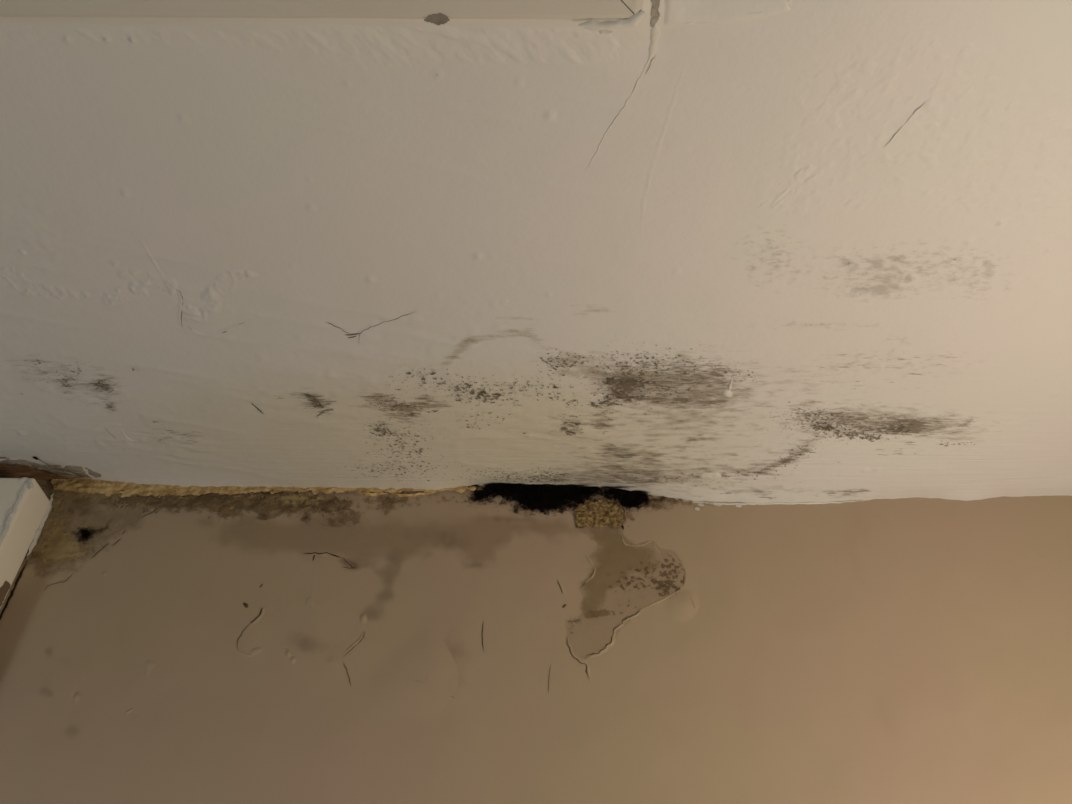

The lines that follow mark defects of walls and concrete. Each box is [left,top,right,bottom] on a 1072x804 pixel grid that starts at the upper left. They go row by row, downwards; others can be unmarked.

crack [584,23,661,172]
crack [326,309,416,344]
water stain [302,393,335,418]
water stain [353,345,759,482]
spalling [644,497,692,509]
water stain [452,401,975,515]
peeling [0,581,10,607]
spalling [569,498,687,623]